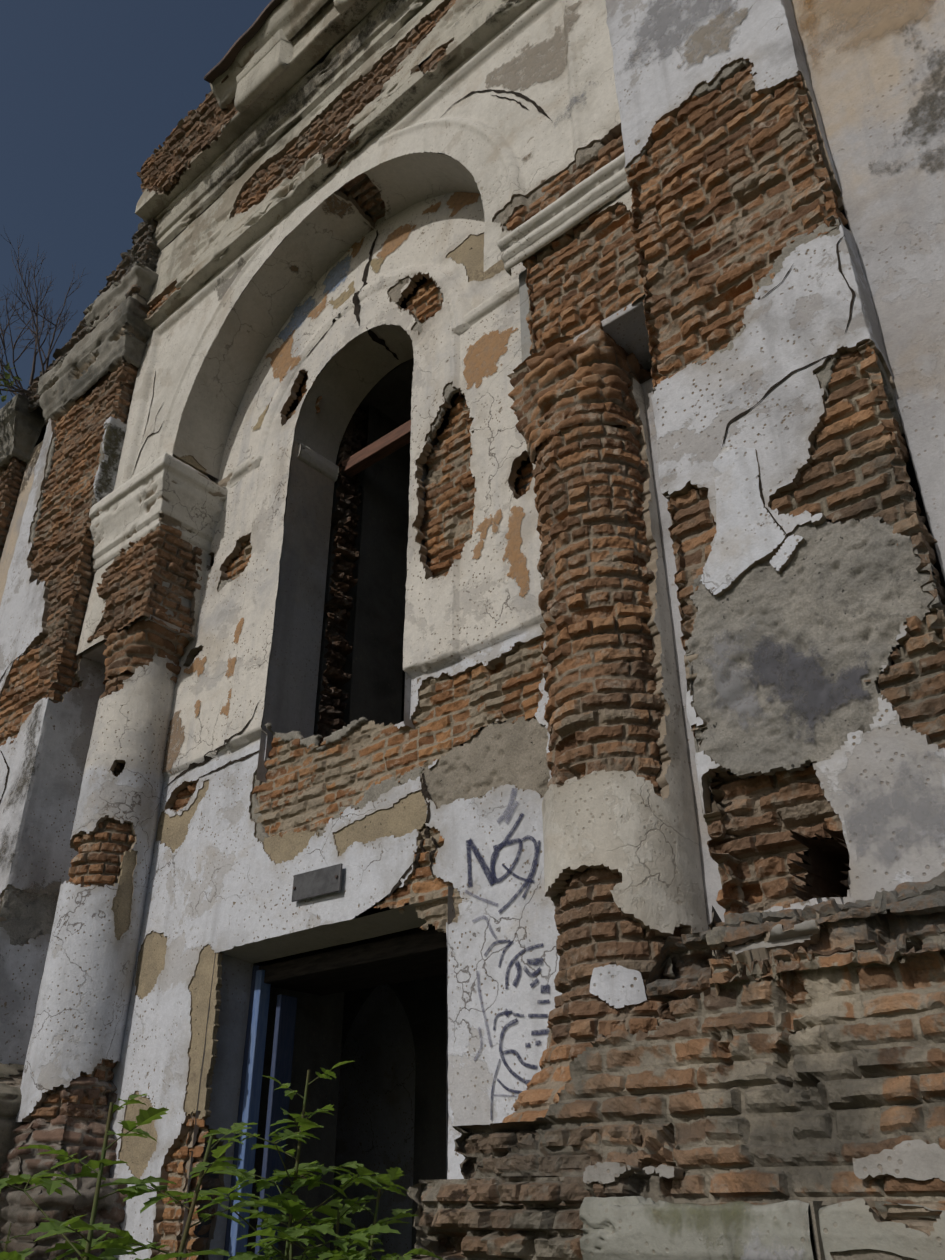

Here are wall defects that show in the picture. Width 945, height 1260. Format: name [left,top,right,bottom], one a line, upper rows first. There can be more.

water stain [630,0,748,68]
crack [442,89,552,121]
water stain [903,50,945,172]
crack [303,230,399,361]
crack [721,236,858,449]
spalling [0,363,202,746]
spalling [251,60,848,933]
crack [758,476,788,536]
flaking render [665,341,945,919]
spalling [156,780,209,853]
spalling [554,868,681,1008]
spalling [832,1249,917,1260]